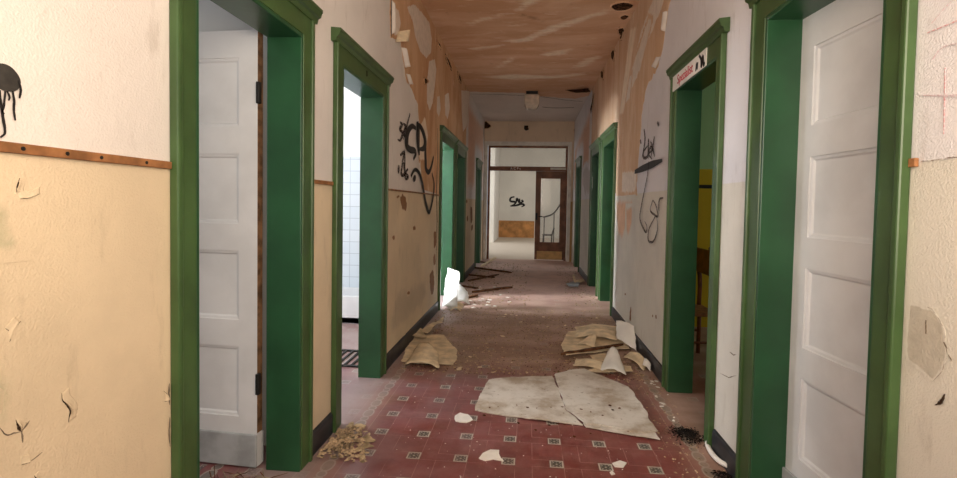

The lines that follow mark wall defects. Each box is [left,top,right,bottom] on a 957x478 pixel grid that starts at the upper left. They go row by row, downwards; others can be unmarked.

peeling [390,0,671,201]
peeling [61,388,78,422]
peeling [0,418,42,478]